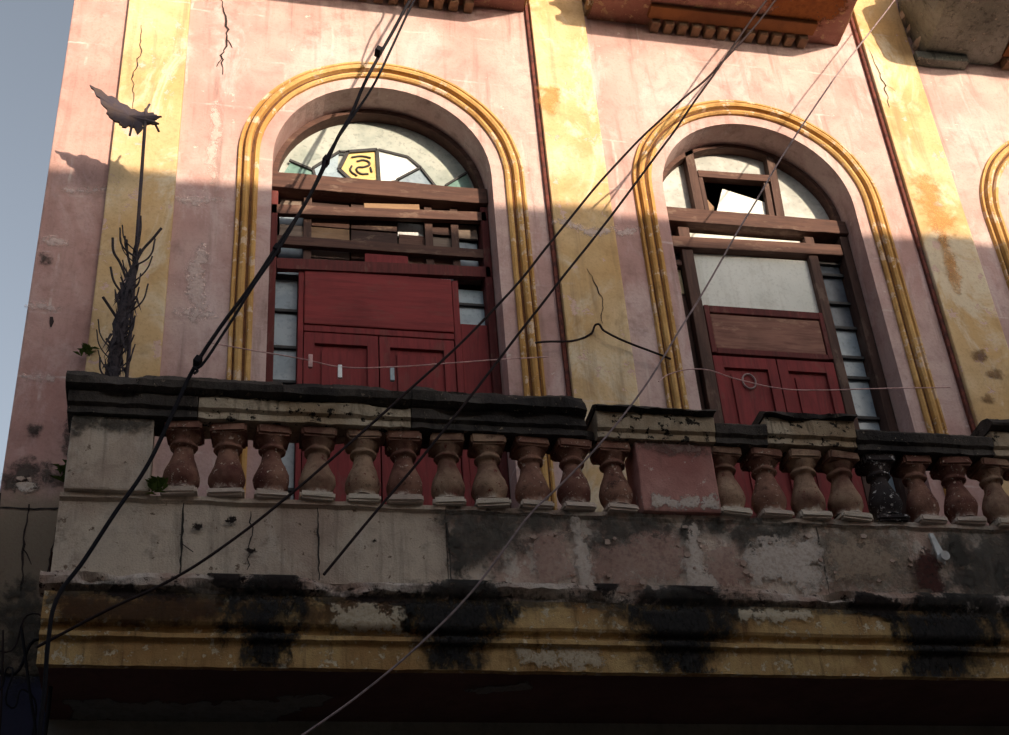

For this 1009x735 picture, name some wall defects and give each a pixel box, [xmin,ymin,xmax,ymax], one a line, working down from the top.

crack [216,0,232,75]
crack [131,28,142,108]
crack [179,503,193,573]
peeling [330,592,429,635]
water stain [0,507,1009,684]
spalling [593,583,619,597]
spalling [680,586,715,596]
peeling [738,608,814,625]
peeling [741,530,832,597]
spalling [847,591,901,618]
spalling [907,547,945,593]